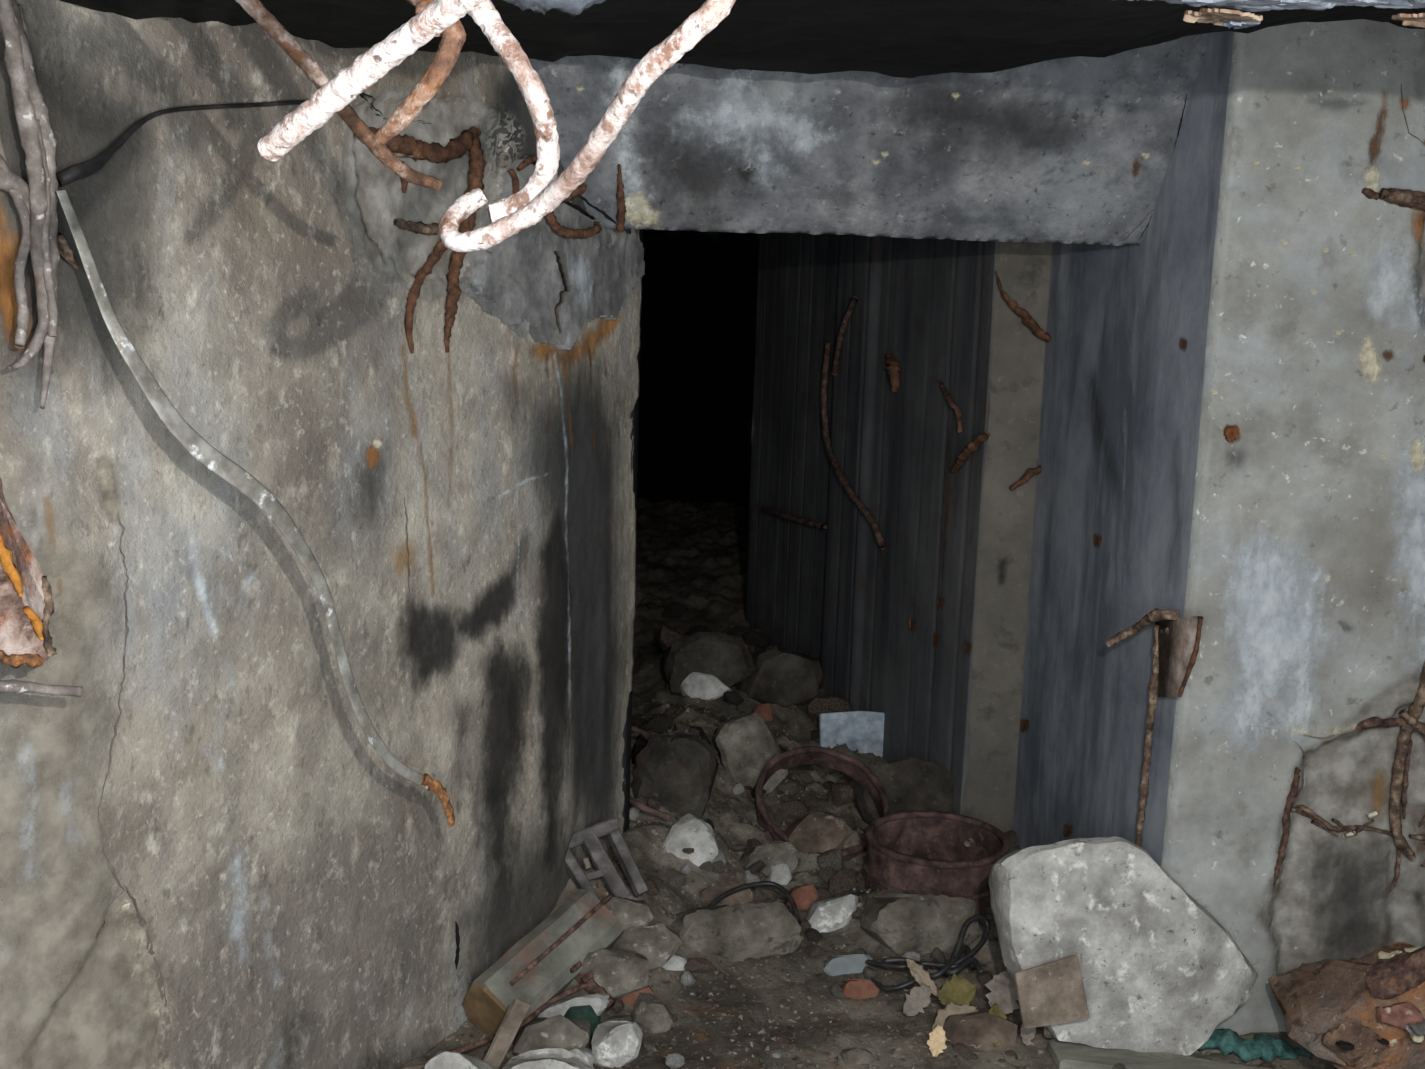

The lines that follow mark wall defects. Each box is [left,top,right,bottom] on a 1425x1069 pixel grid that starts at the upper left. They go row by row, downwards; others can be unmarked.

corrosion [0,238,25,349]
spalling [343,90,645,350]
corrosion [537,315,619,382]
corrosion [1365,111,1425,242]
spalling [1413,224,1425,321]
spalling [1259,658,1425,974]